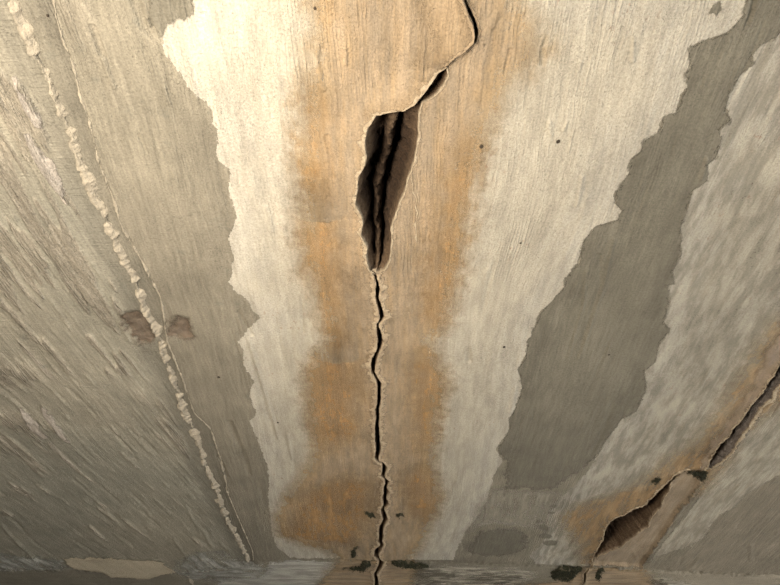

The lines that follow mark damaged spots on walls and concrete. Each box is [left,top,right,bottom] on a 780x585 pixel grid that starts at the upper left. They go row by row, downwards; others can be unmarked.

water stain [146,0,340,585]
rust [276,0,530,585]
crack [351,0,481,585]
rust [528,567,653,585]
water stain [407,0,780,585]
crack [580,361,780,585]